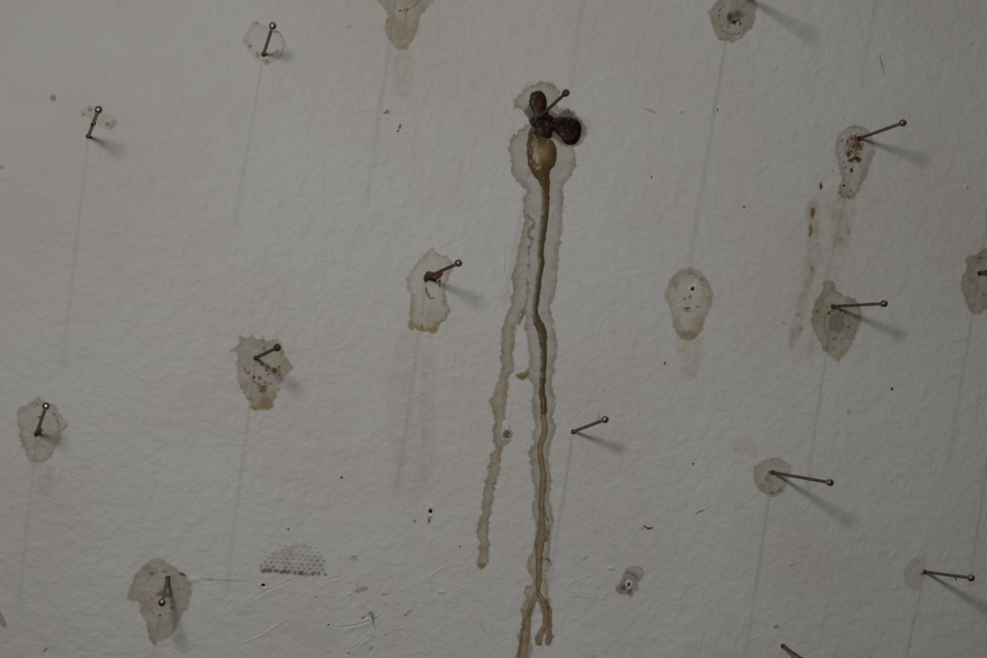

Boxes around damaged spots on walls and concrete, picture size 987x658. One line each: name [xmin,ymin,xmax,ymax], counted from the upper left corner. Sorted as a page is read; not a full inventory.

rust [845,135,864,173]
rust [424,271,443,299]
rust [409,313,448,333]
water stain [477,84,582,657]